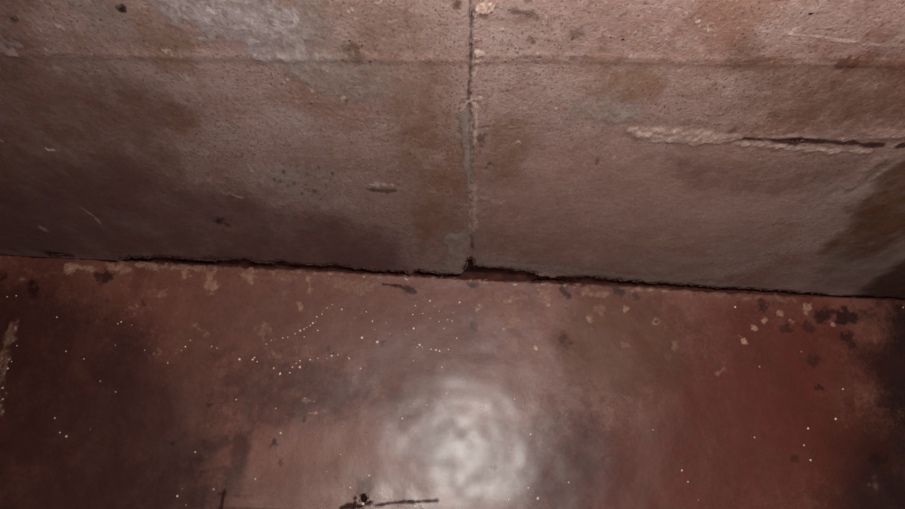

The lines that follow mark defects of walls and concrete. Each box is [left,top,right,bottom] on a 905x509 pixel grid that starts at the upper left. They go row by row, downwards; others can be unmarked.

leakage [158,0,390,100]
crack [473,0,495,18]
leakage [0,46,398,272]
crack [460,50,484,235]
crack [728,136,905,149]
leakage [827,158,905,270]
crack [0,250,905,300]
leakage [0,289,201,509]
leakage [830,263,905,509]
leakage [219,469,427,509]